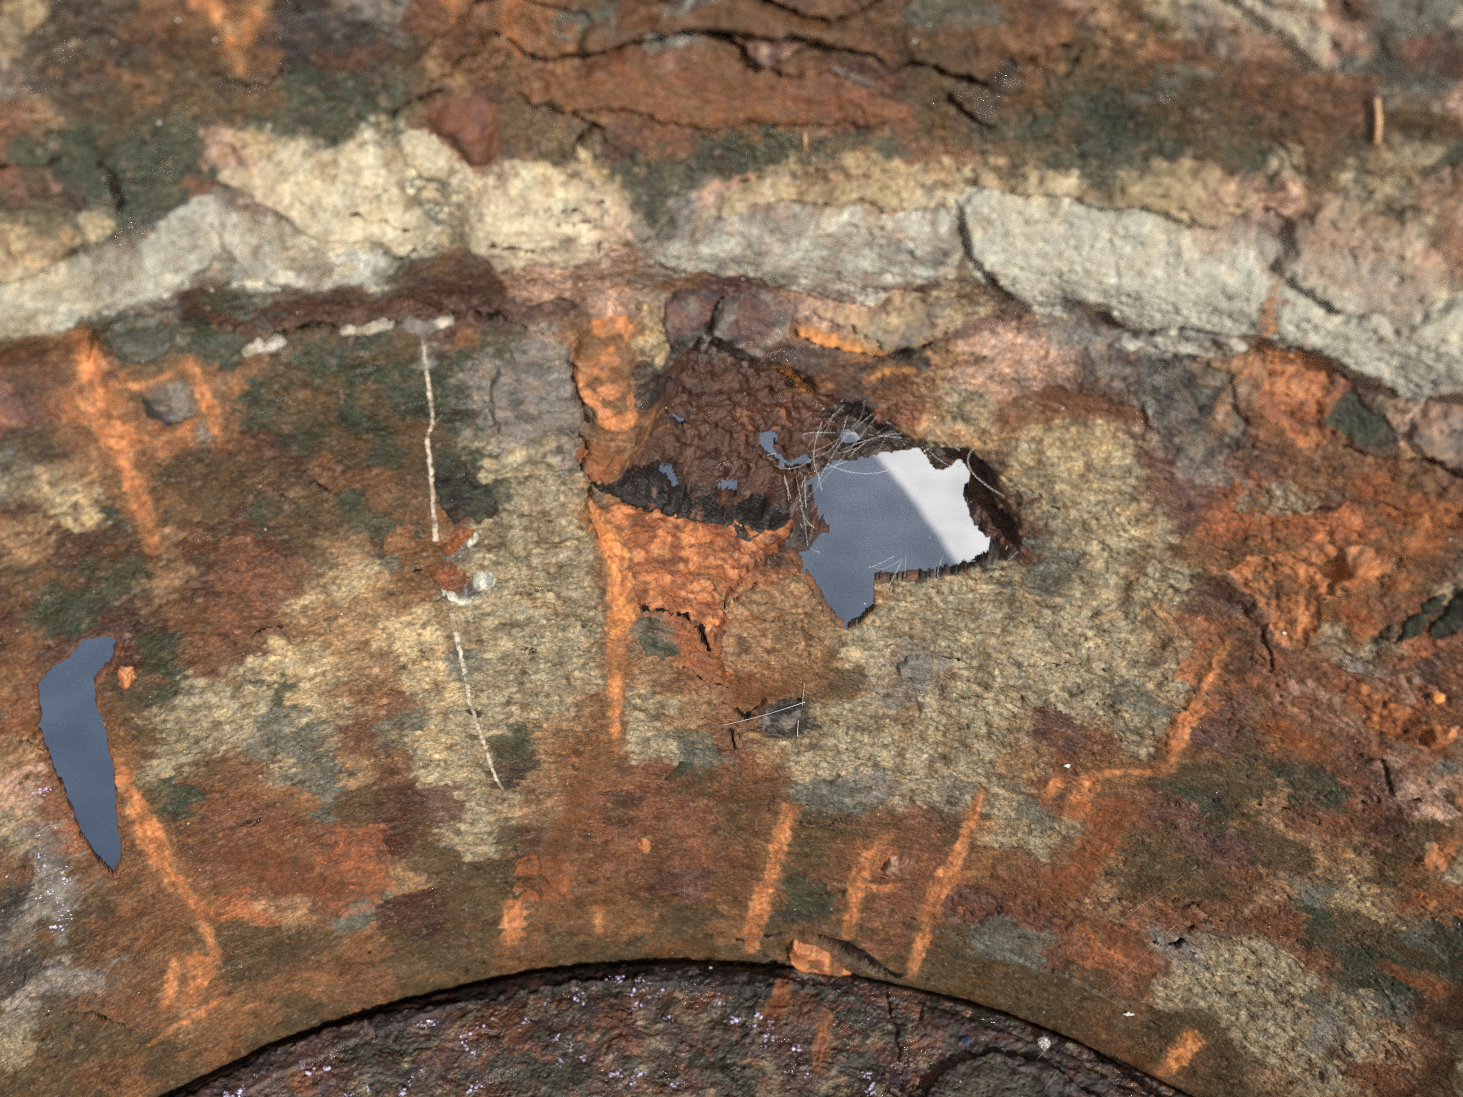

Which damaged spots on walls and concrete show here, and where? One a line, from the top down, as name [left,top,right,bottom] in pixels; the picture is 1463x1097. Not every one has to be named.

crack [392,0,655,160]
crack [703,0,994,131]
crack [1027,43,1083,80]
peeling [0,128,583,342]
peeling [464,159,632,271]
peeling [655,152,1463,471]
rust [60,316,223,554]
rust [583,500,638,648]
spalling [588,340,851,689]
rust [114,760,222,1038]
rust [907,785,986,974]
crack [734,930,903,1097]